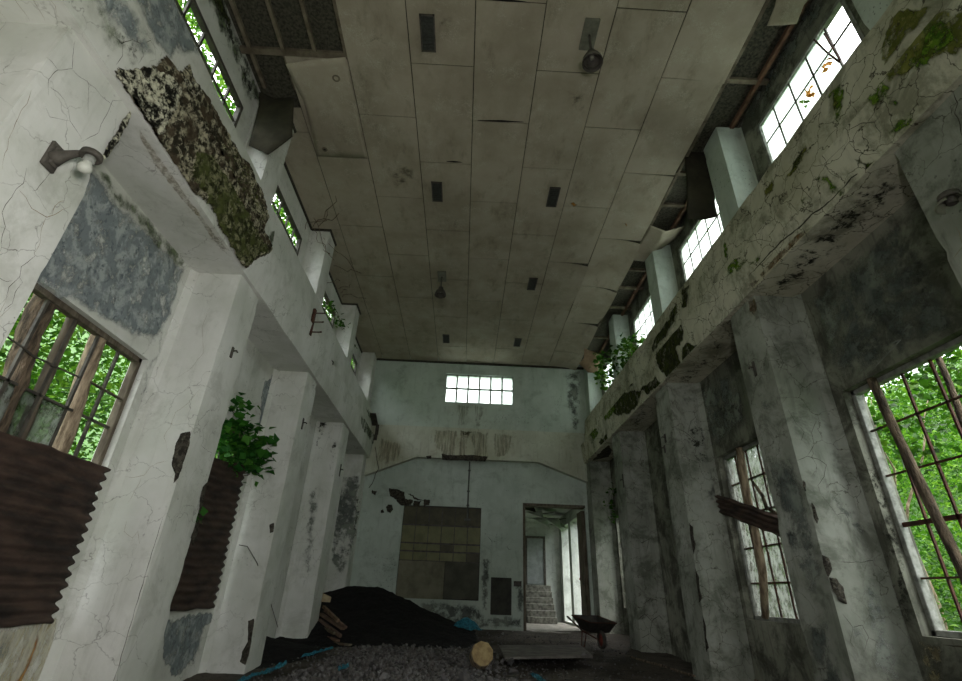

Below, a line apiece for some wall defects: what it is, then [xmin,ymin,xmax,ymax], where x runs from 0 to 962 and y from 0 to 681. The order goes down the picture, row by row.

water stain [105,0,197,56]
crack [3,43,122,160]
flaking render [103,55,273,268]
crack [0,168,91,316]
water stain [777,174,894,288]
spalling [172,431,191,482]
water stain [332,476,359,572]
peeling [381,488,430,513]
spalling [240,619,254,665]